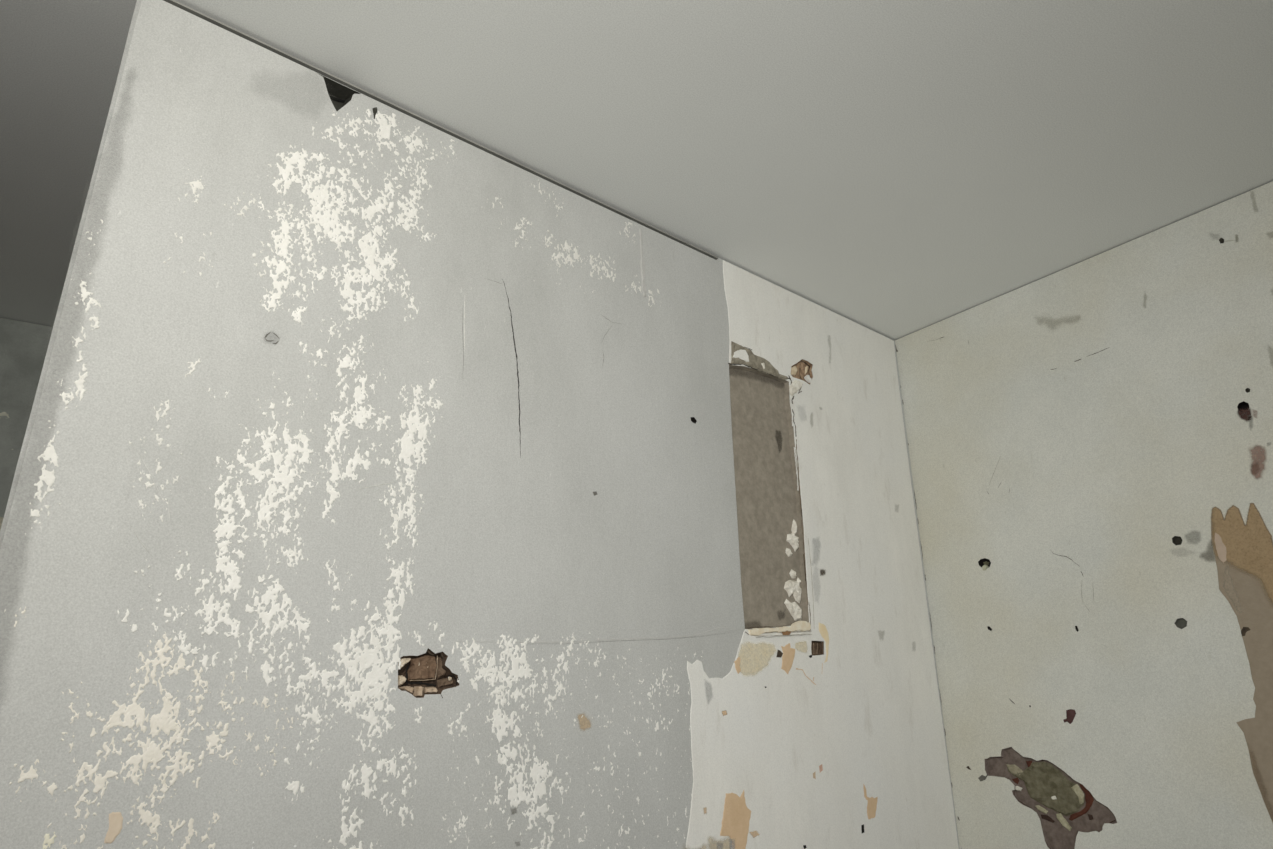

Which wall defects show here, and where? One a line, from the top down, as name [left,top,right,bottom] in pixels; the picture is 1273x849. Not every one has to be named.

crack [484,278,521,458]
flaking render [9,73,959,849]
spalling [978,558,991,571]
spalling [966,747,1117,849]
peeling [1064,709,1076,724]
peeling [1211,503,1273,822]